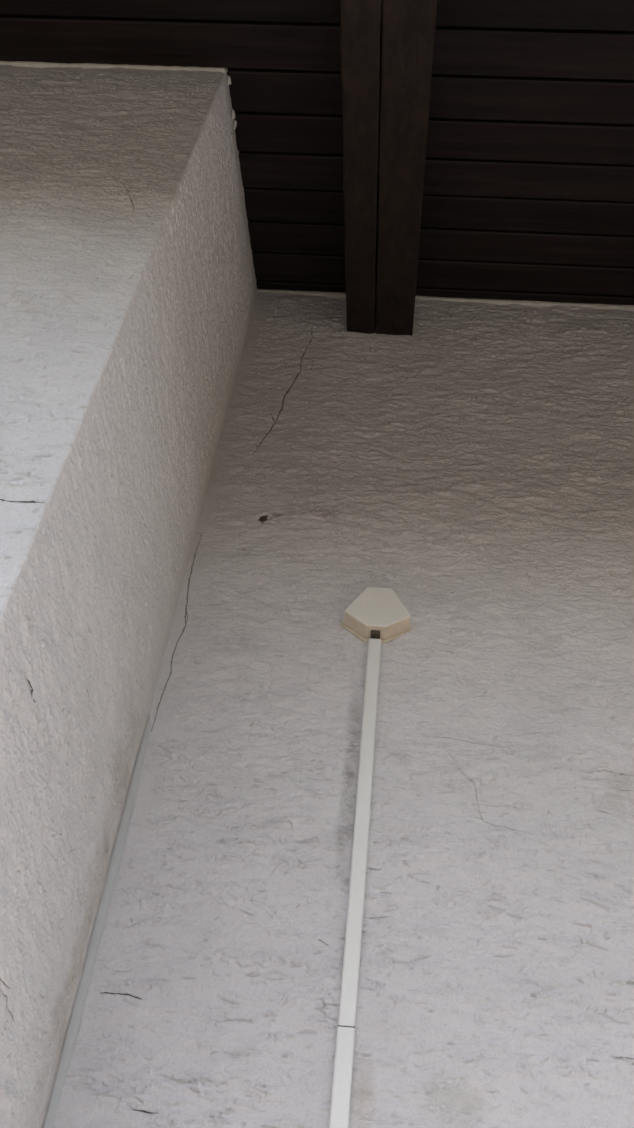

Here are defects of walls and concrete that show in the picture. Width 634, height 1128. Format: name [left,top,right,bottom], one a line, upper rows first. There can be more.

crack [252,329,314,455]
crack [151,533,203,732]